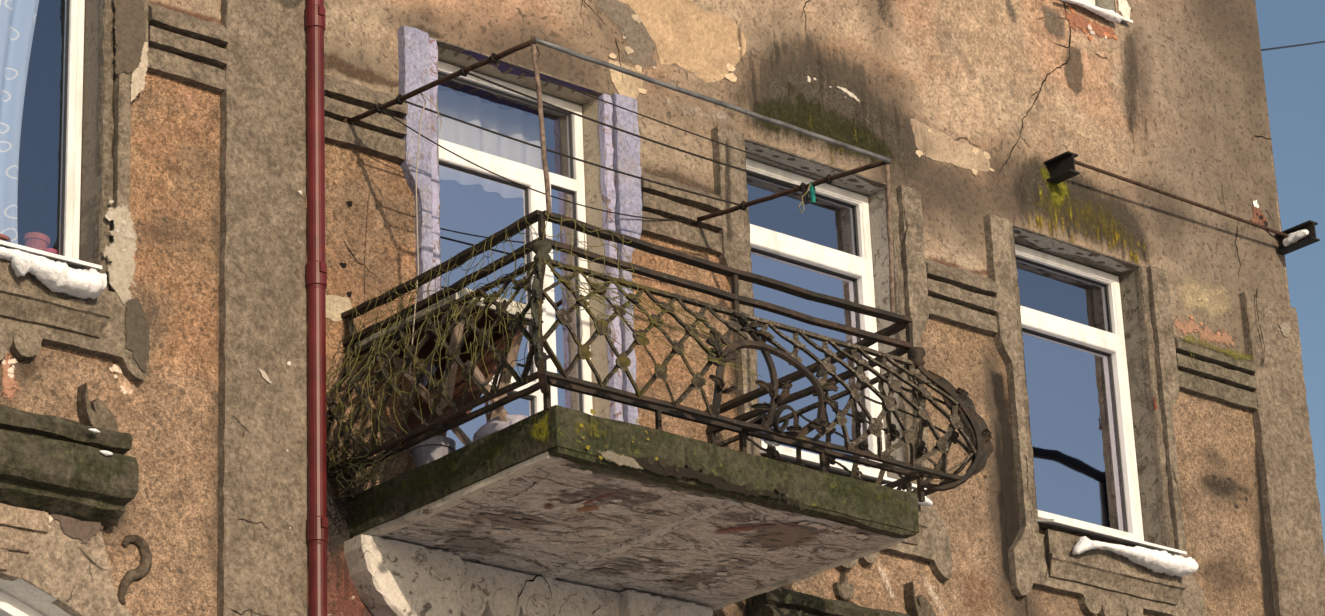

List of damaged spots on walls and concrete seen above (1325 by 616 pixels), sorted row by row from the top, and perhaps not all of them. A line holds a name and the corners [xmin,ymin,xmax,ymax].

flaking render [130,42,149,102]
flaking render [596,0,746,99]
damp [737,34,919,172]
flaking render [910,118,995,175]
crack [949,1,1111,174]
flaking render [1064,5,1118,41]
flaking render [1118,0,1131,19]
flaking render [103,200,137,305]
damp [1015,157,1147,262]
flaking render [1173,286,1237,347]